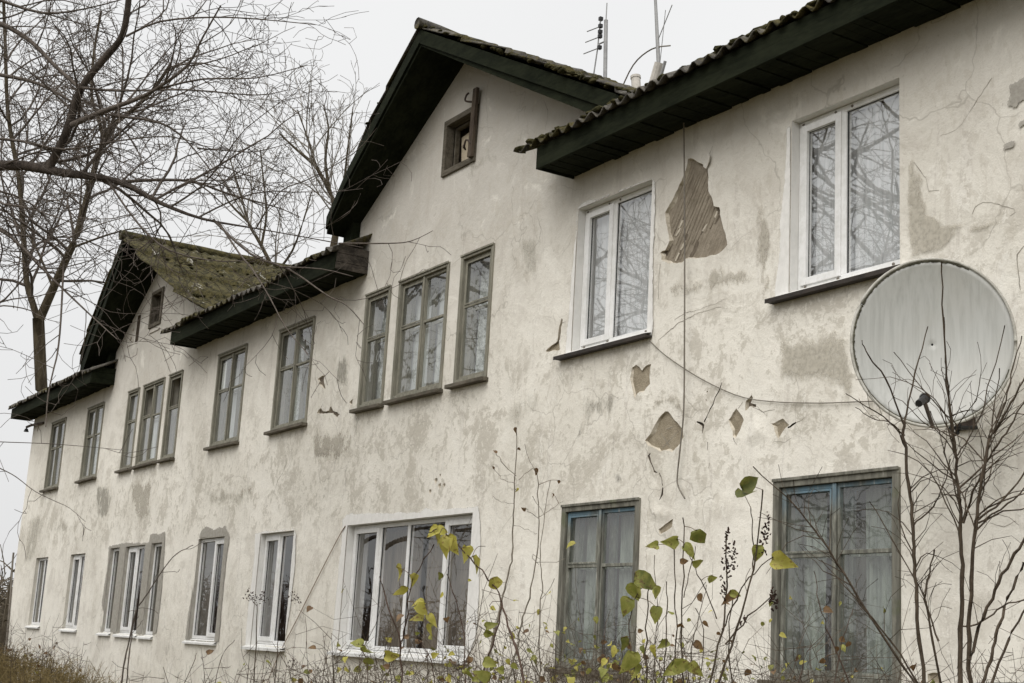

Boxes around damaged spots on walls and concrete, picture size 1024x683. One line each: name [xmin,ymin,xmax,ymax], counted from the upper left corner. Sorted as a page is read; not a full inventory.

spalling [660,149,727,264]
spalling [630,364,651,398]
spalling [645,411,683,452]
spalling [729,395,756,445]
spalling [771,417,805,438]